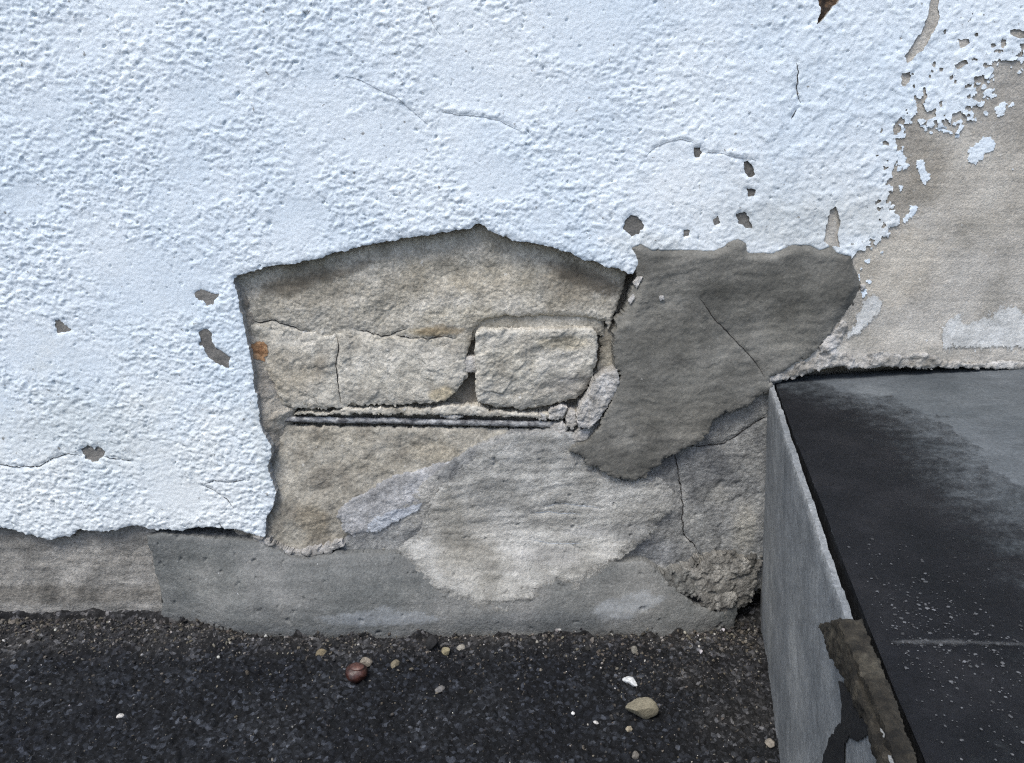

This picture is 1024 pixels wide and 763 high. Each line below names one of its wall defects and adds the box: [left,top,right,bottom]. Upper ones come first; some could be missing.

flaking render [775,0,1024,376]
peeling [623,215,644,237]
peeling [194,289,219,306]
peeling [55,320,71,333]
peeling [199,328,231,368]
rust [251,341,268,361]
crack [701,300,765,377]
flaking render [233,224,633,557]
peeling [82,445,105,461]
crack [675,417,765,555]
spalling [659,548,763,617]